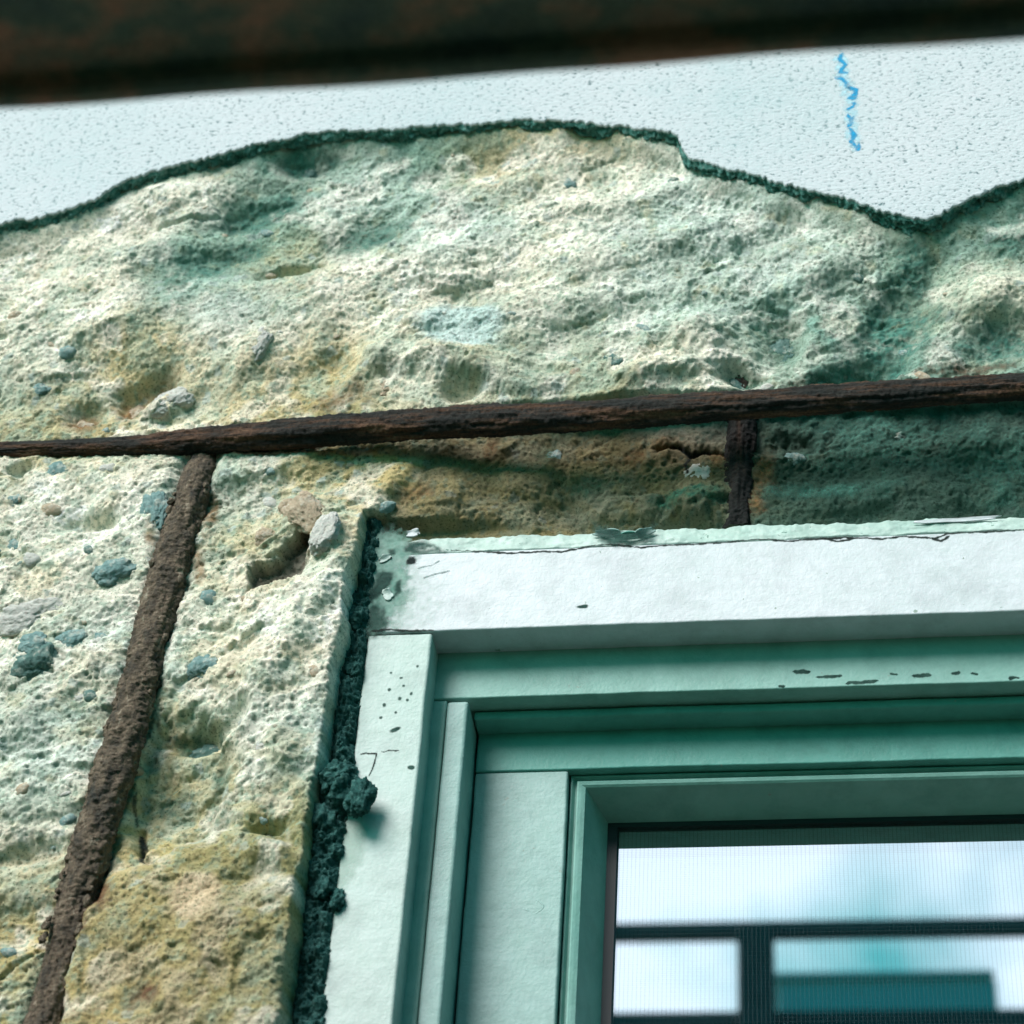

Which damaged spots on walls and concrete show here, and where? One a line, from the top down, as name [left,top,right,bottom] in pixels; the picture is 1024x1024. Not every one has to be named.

spalling [0,120,1024,442]
spalling [0,454,192,1024]
corrosion [0,364,1024,1024]
spalling [103,401,1024,1024]